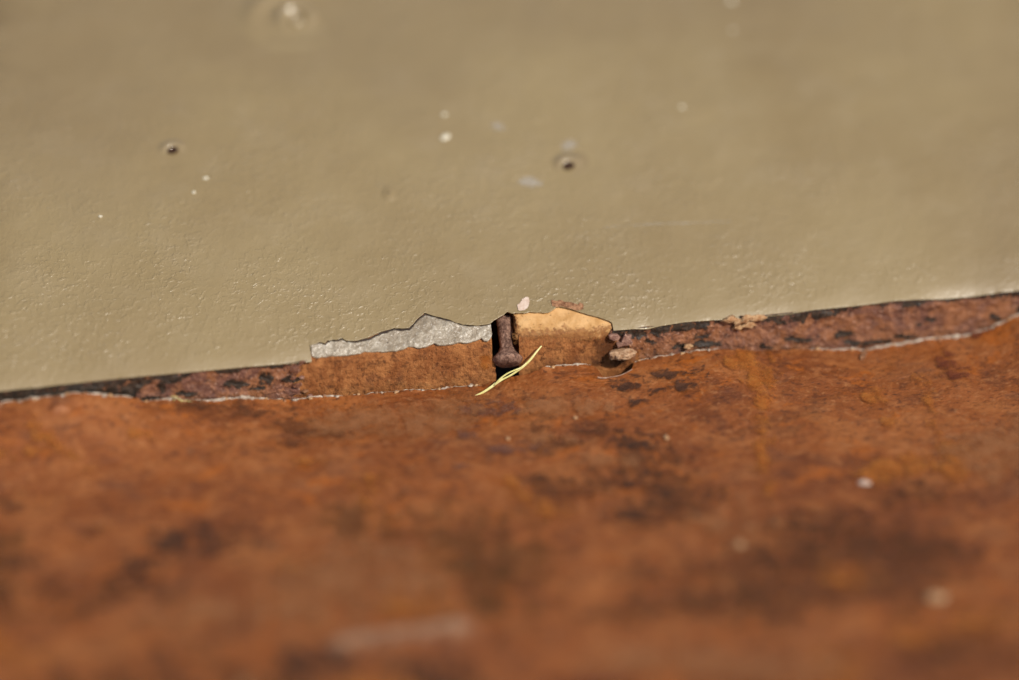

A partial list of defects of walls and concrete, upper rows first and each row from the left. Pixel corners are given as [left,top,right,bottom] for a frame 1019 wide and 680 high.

spalling [0,315,492,407]
spalling [515,297,718,377]
corrosion [0,291,1019,680]